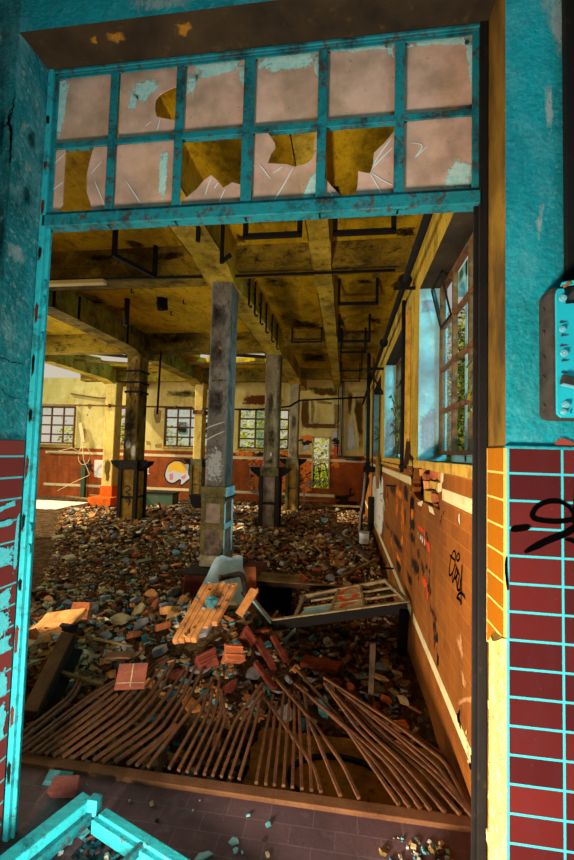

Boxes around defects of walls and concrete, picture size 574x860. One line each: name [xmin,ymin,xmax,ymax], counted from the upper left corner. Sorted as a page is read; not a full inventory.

crack [1,90,15,167]
peeling [34,281,46,344]
spalling [417,469,444,515]